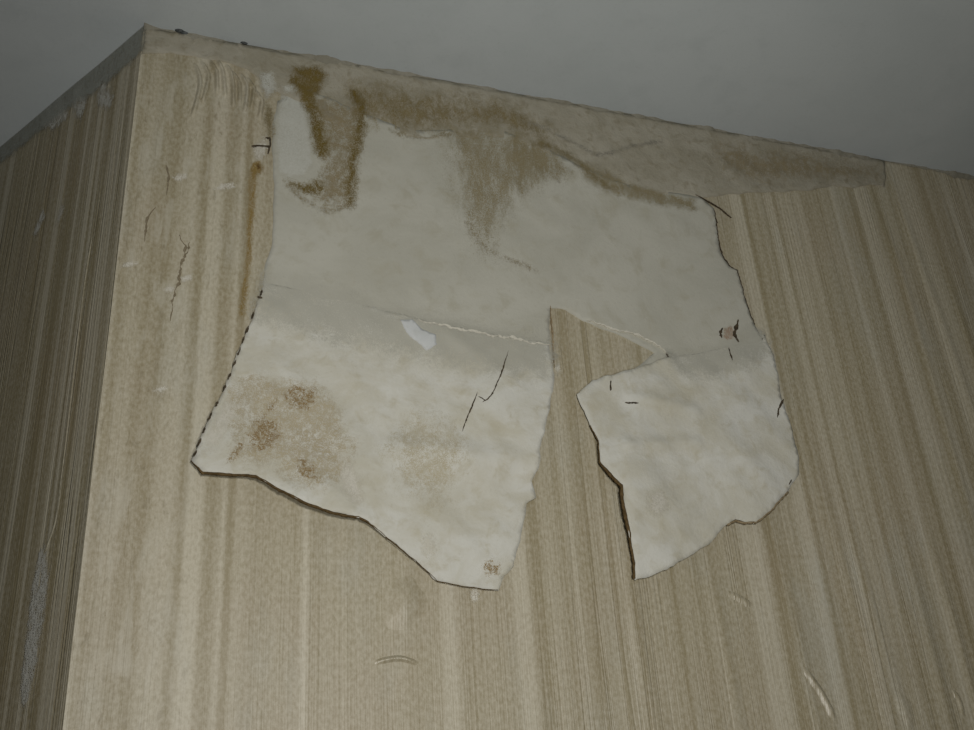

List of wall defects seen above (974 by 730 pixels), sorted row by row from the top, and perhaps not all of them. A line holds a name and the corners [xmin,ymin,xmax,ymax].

water stain [283,63,699,271]
flaking render [250,94,763,374]